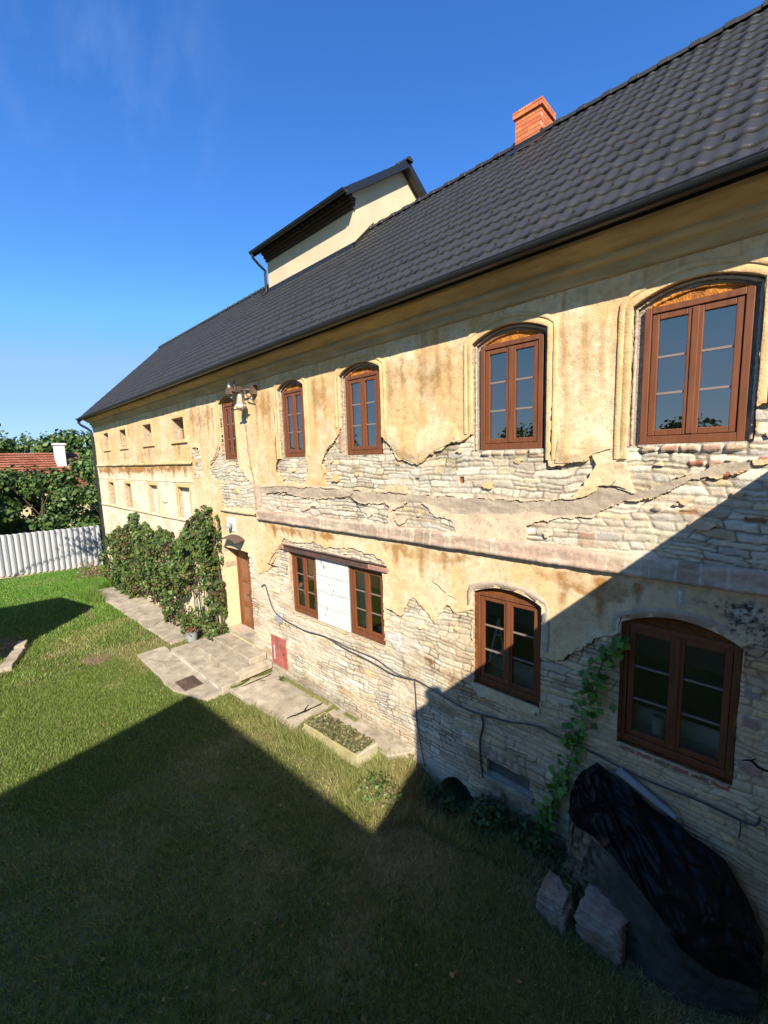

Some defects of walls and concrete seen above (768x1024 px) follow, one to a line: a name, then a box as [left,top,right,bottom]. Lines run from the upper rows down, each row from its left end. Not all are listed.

spalling [193,429,596,533]
spalling [526,403,768,571]
spalling [249,539,768,976]